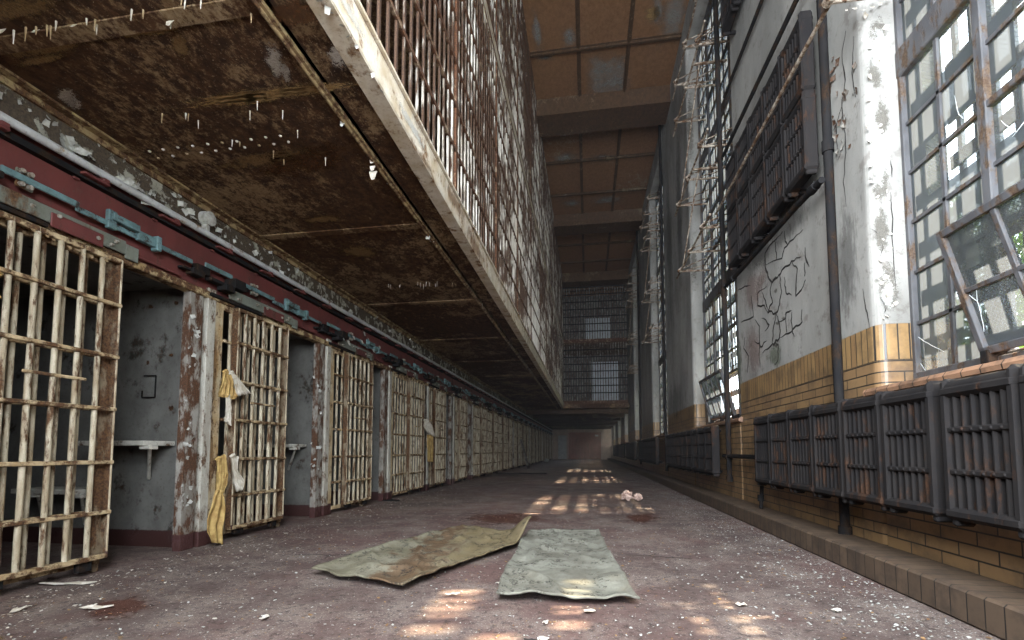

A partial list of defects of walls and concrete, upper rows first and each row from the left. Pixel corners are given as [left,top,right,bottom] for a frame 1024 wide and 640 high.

peeling [39,114,100,161]
spalling [830,0,900,319]
crack [736,231,809,373]